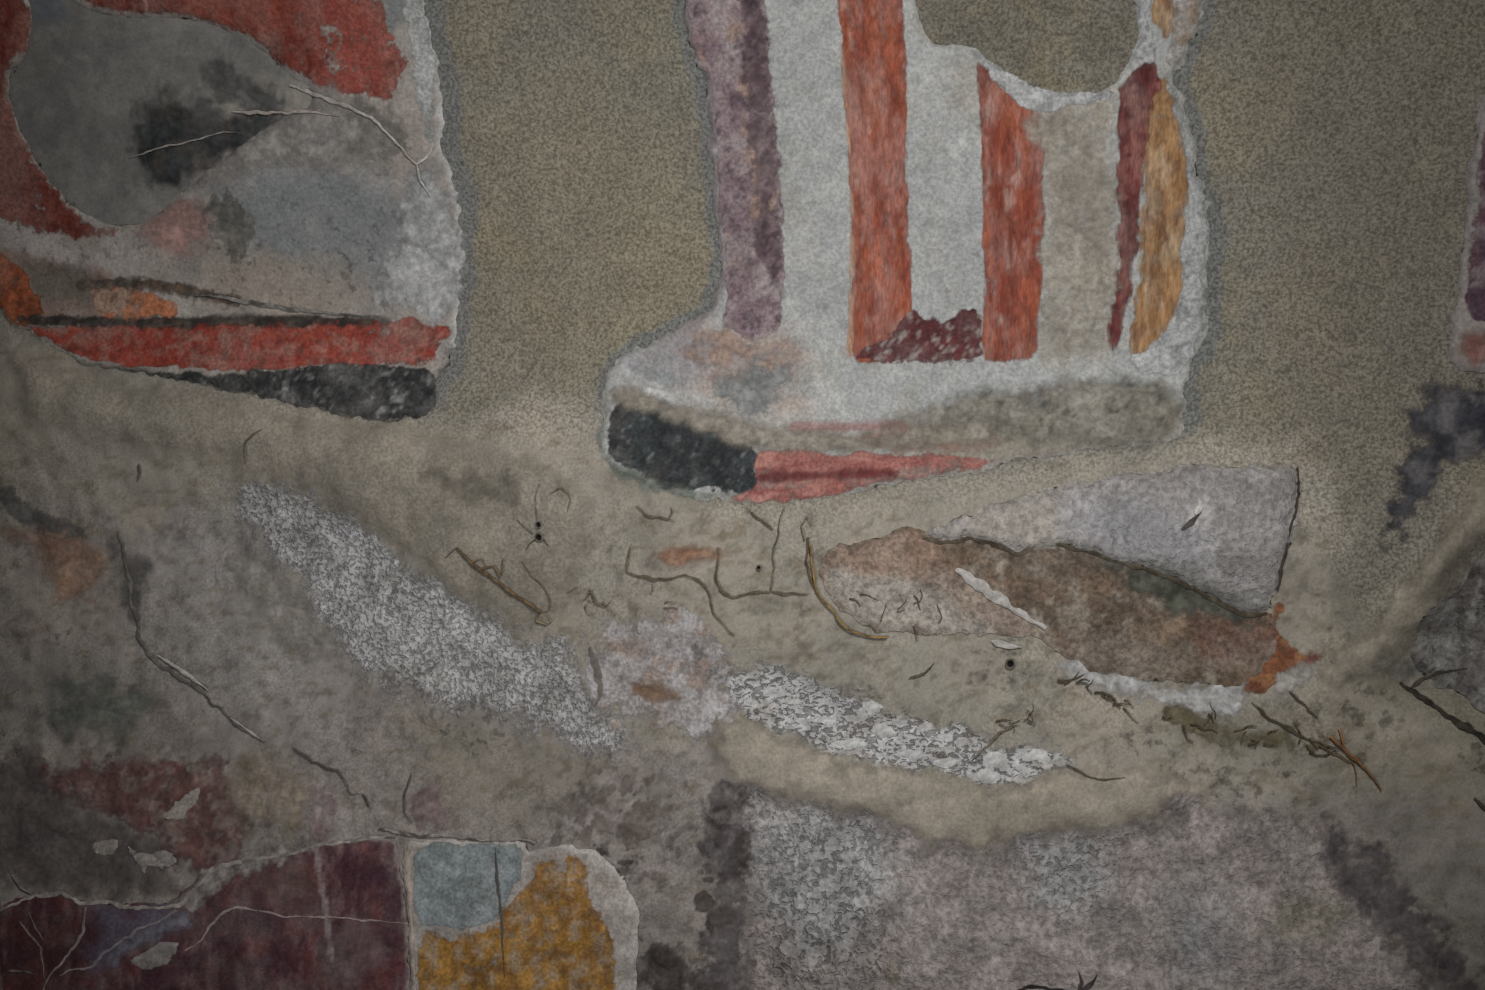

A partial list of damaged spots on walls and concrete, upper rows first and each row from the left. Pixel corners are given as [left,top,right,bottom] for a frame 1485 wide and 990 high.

flaking render [9,0,364,225]
spalling [402,0,437,142]
flaking render [915,0,1209,376]
crack [552,487,571,513]
crack [590,506,807,636]
flaking render [819,526,1277,687]
peeling [1181,498,1204,530]
crack [0,531,536,990]
crack [588,647,603,707]
crack [1399,668,1485,743]
crack [1017,971,1098,990]